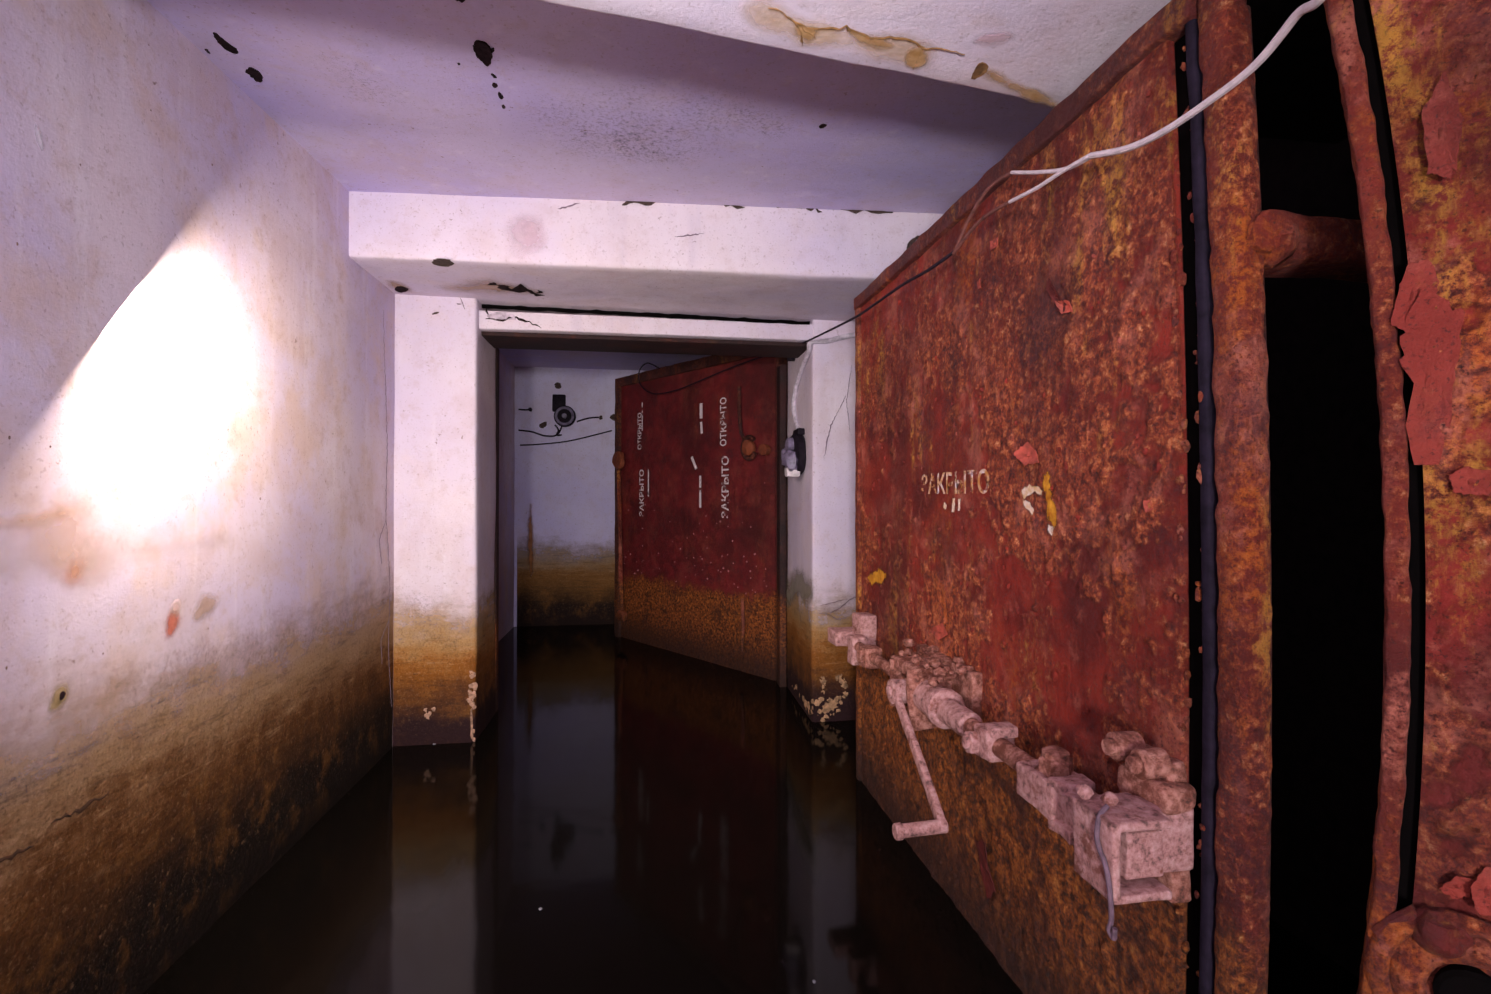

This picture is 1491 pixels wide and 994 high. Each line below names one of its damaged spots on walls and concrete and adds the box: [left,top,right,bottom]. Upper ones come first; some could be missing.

rust [753,6,926,68]
peeling [1421,71,1464,180]
rust [1169,190,1195,287]
peeling [1391,260,1491,496]
rust [1172,390,1203,494]
rust [1043,472,1057,527]
damp [517,545,615,627]
rust [867,568,886,586]
rust [1173,581,1202,604]
damp [786,572,856,722]
rust [1177,646,1202,731]
damp [0,592,496,994]